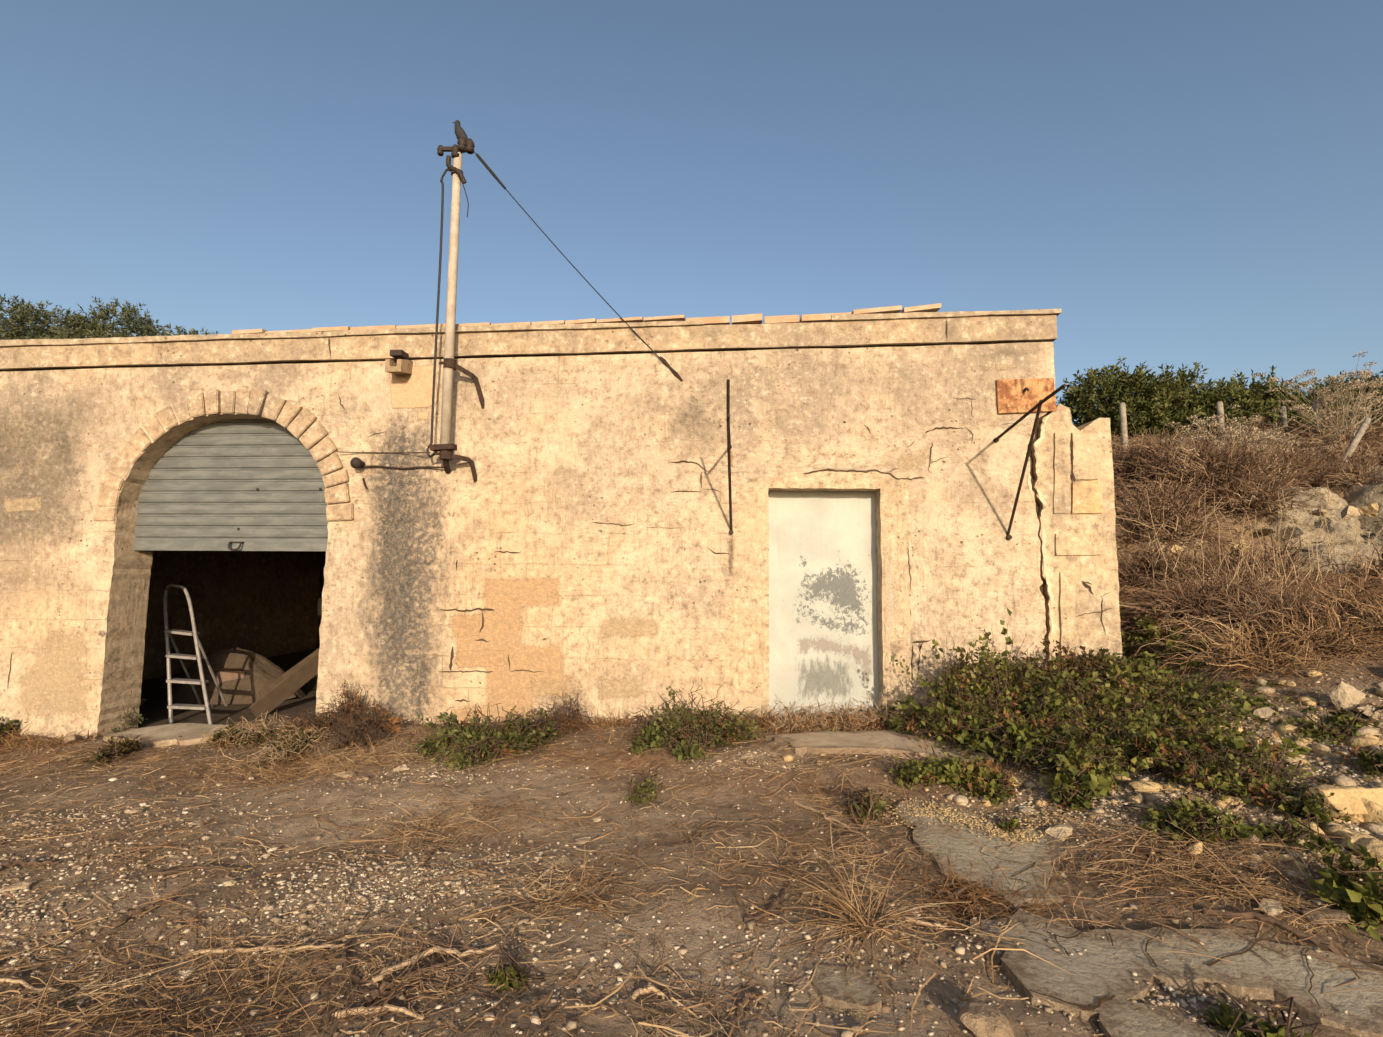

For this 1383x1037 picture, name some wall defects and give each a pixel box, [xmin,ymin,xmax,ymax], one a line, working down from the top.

leakage [367,419,451,717]
crack [803,398,1111,657]